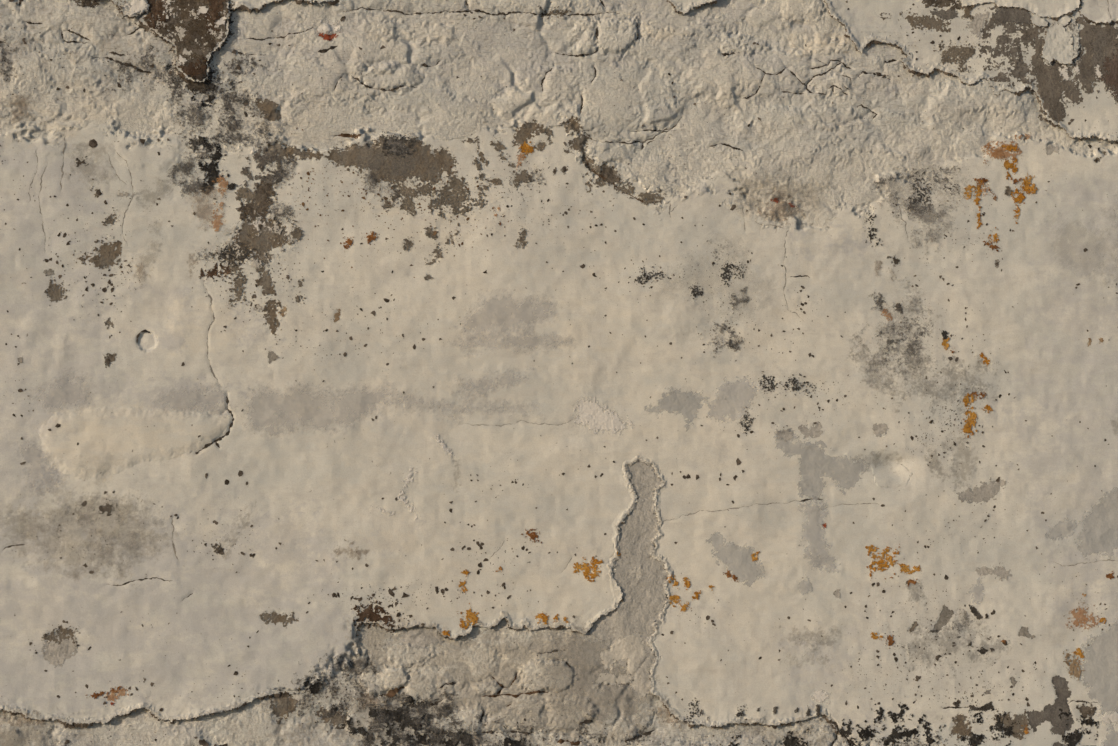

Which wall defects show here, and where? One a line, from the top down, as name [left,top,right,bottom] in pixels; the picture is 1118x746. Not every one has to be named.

crack [238,26,337,55]
crack [334,0,683,217]
crack [721,52,897,118]
spalling [0,0,1118,364]
rust [963,134,1038,252]
water stain [635,266,669,287]
rust [961,392,993,439]
peeling [775,422,869,500]
spalling [0,455,871,746]
rust [573,556,603,582]
rust [865,544,922,586]
peeling [994,675,1118,746]